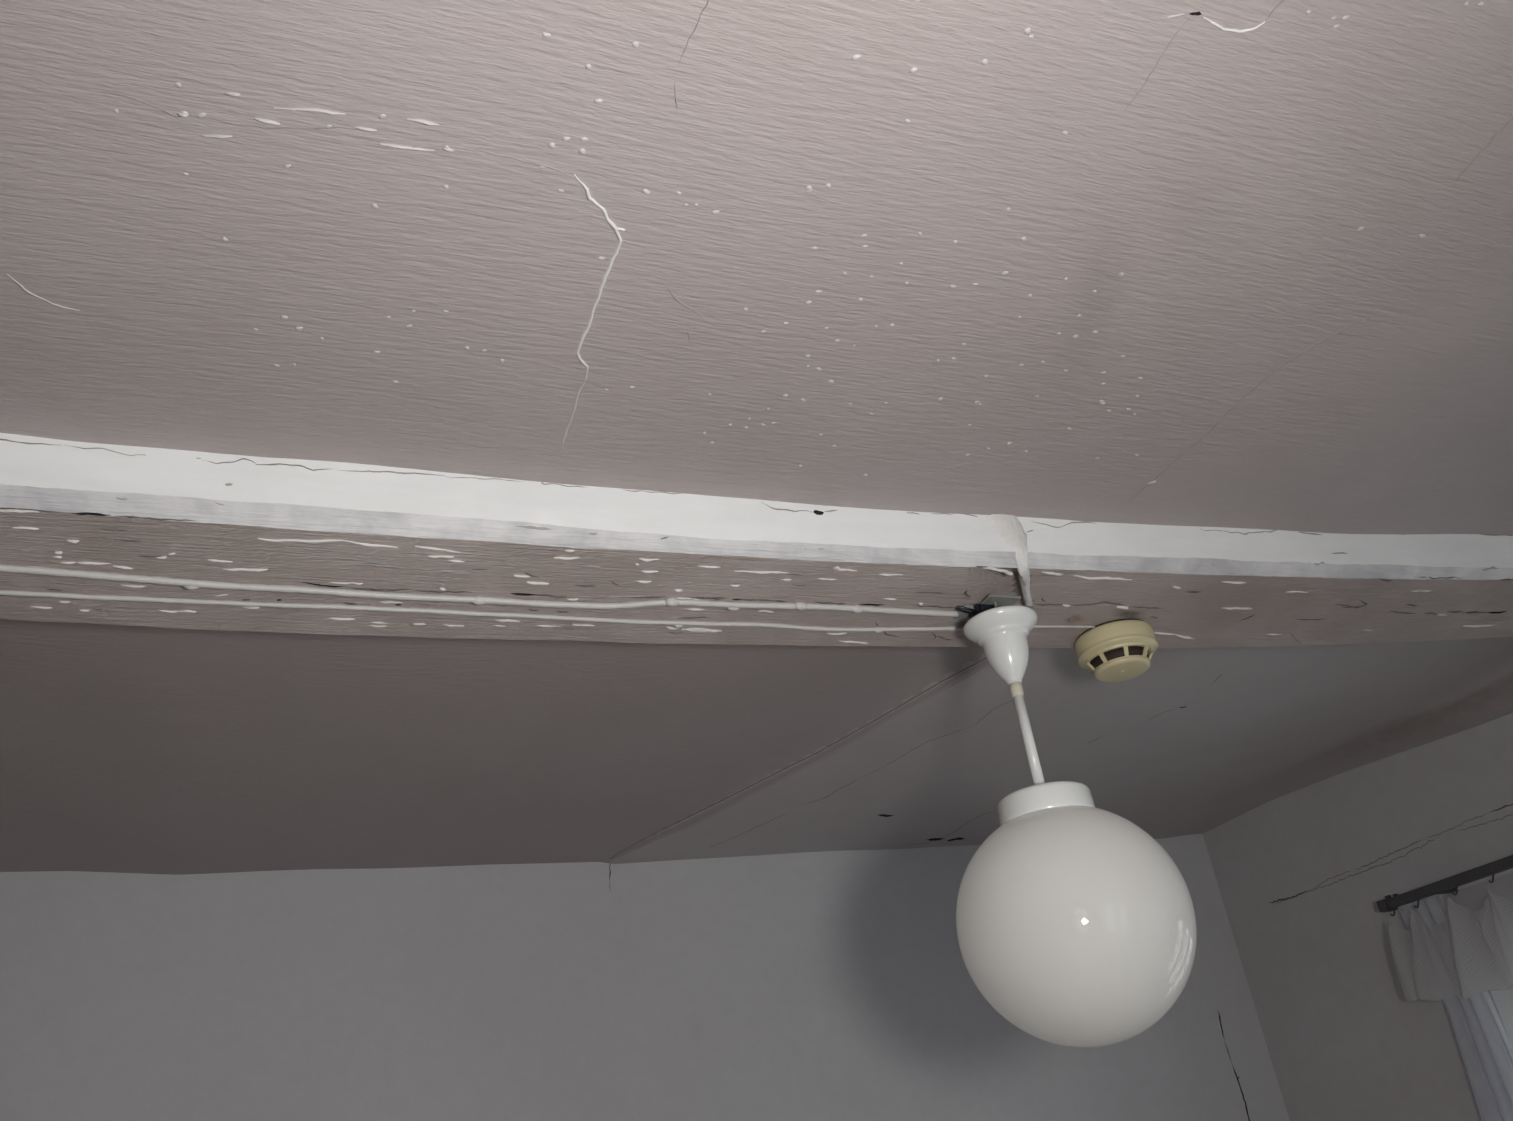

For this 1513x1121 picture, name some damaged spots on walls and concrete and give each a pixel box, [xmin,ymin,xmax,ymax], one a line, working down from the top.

crack [1123,0,1284,112]
crack [93,87,625,487]
crack [0,439,142,456]
crack [762,502,837,515]
peeling [0,528,176,612]
peeling [208,559,268,572]
peeling [258,538,487,591]
peeling [554,550,659,601]
peeling [698,566,857,588]
peeling [1035,572,1194,639]
crack [1269,804,1513,906]
crack [1218,1012,1250,1121]